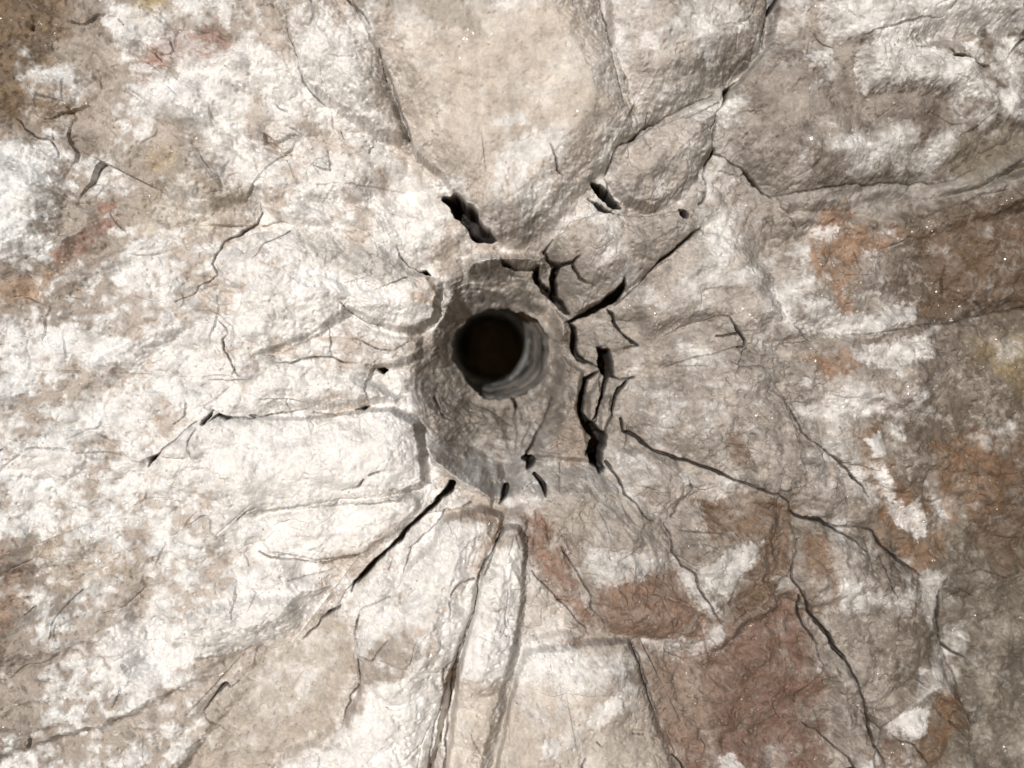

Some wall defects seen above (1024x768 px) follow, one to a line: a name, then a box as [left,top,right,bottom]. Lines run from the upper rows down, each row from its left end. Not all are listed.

crack [176,203,292,378]
crack [376,248,432,290]
crack [275,302,411,375]
crack [429,0,1024,768]
crack [1,403,370,467]
crack [342,471,382,492]
crack [259,480,472,724]
crack [204,680,240,711]